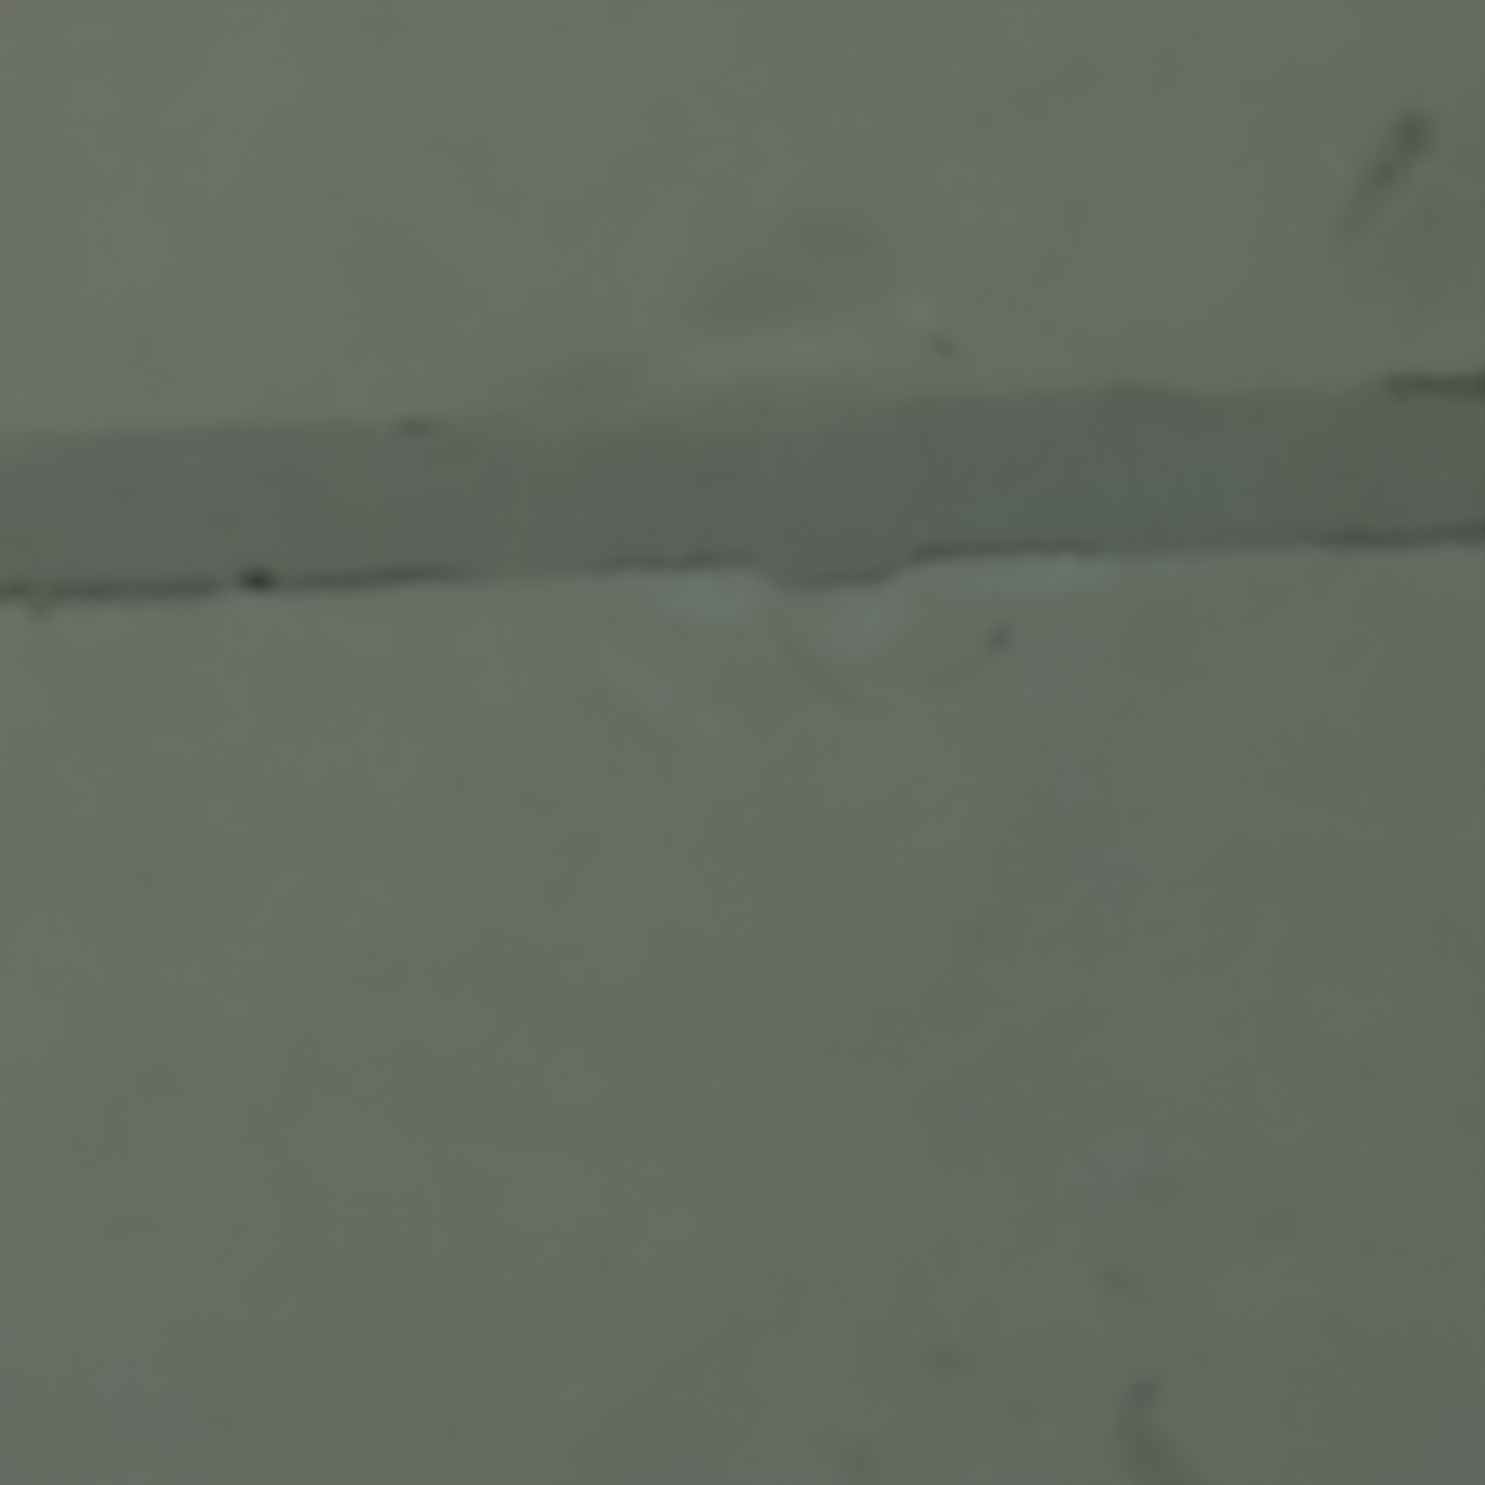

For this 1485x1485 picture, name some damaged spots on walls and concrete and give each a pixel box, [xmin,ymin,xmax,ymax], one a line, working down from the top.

crack [1370,365,1485,408]
crack [0,562,473,625]
crack [579,546,758,581]
crack [801,512,1485,592]